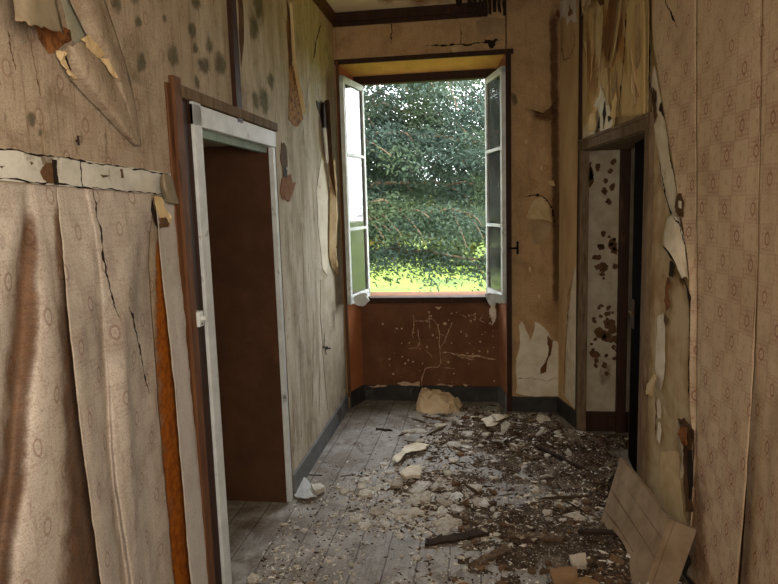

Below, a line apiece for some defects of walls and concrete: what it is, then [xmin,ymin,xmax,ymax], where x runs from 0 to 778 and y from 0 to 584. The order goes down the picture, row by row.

flaking render [35,0,86,54]
damp [195,40,225,88]
damp [250,0,262,38]
crack [424,30,500,49]
damp [253,73,273,112]
spalling [40,159,59,185]
crack [0,148,169,174]
flaking render [650,66,688,265]
crack [0,178,162,389]
crack [409,314,497,382]
flaking render [516,265,577,409]
flaking render [655,277,695,524]